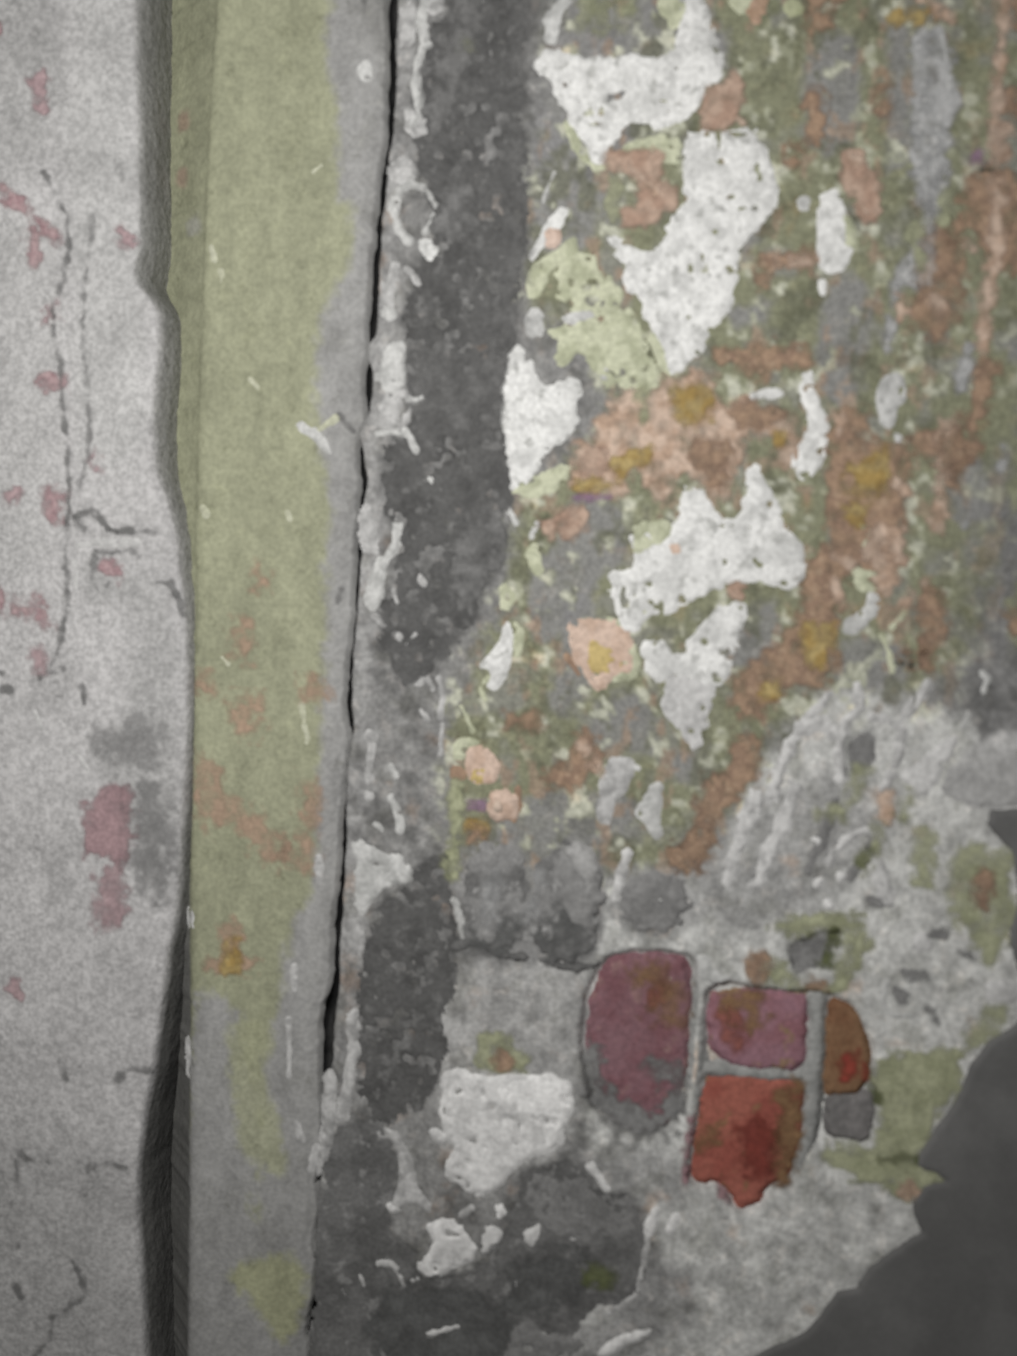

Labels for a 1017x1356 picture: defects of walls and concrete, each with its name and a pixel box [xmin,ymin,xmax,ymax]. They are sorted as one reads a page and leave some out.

crack [0,170,147,704]
crack [337,0,398,509]
spalling [357,0,807,785]
corrosion [698,70,745,130]
peeling [749,370,831,481]
peeling [796,188,858,297]
corrosion [732,0,1017,719]
crack [337,543,362,735]
crack [323,789,347,1074]
spalling [294,678,1017,1356]
corrosion [666,734,760,875]
corrosion [745,951,771,988]